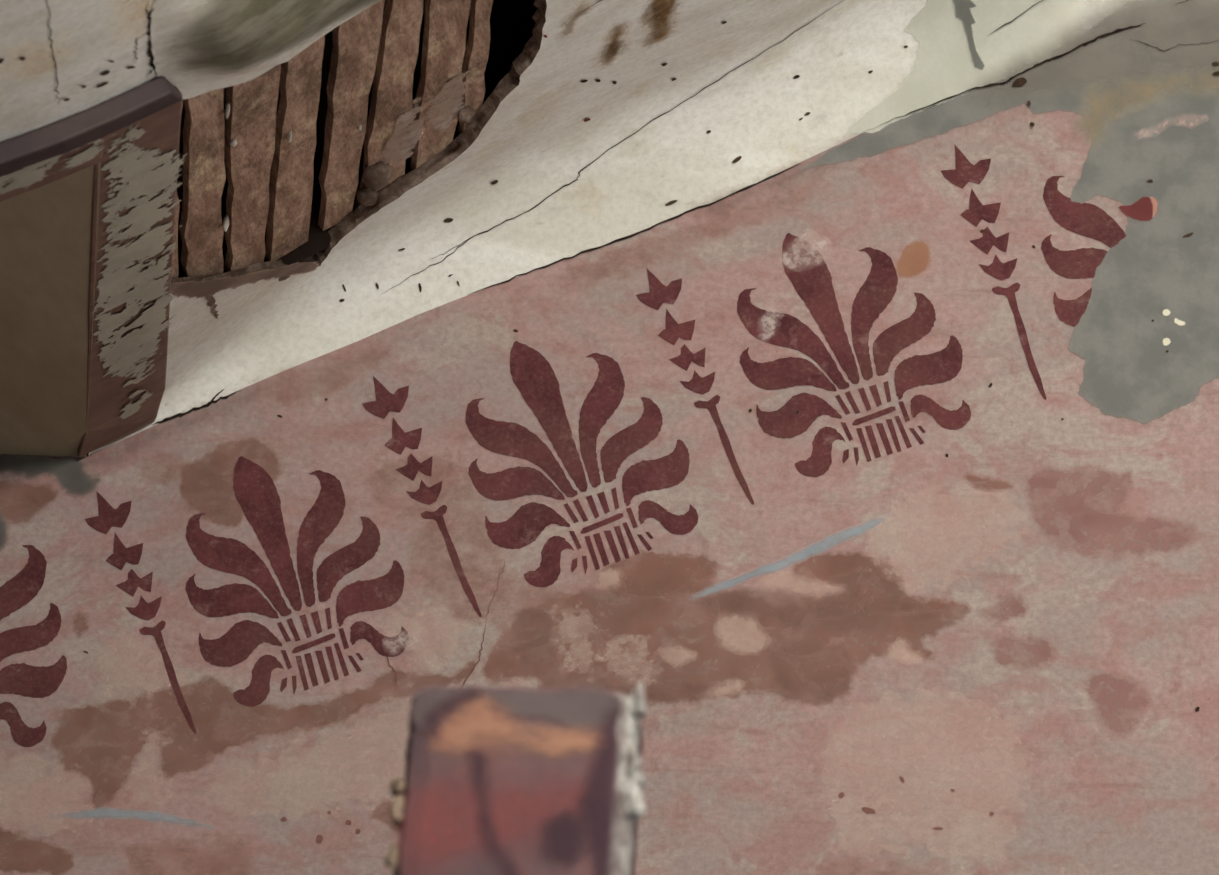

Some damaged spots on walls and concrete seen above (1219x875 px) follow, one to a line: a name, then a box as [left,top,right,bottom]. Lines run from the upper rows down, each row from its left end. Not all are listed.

peeling [0,0,547,419]
crack [380,1,842,295]
leakage [601,23,627,65]
leakage [641,0,677,45]
peeling [800,0,1219,424]
crack [461,562,505,687]
leakage [52,551,968,806]
leakage [1028,470,1193,555]